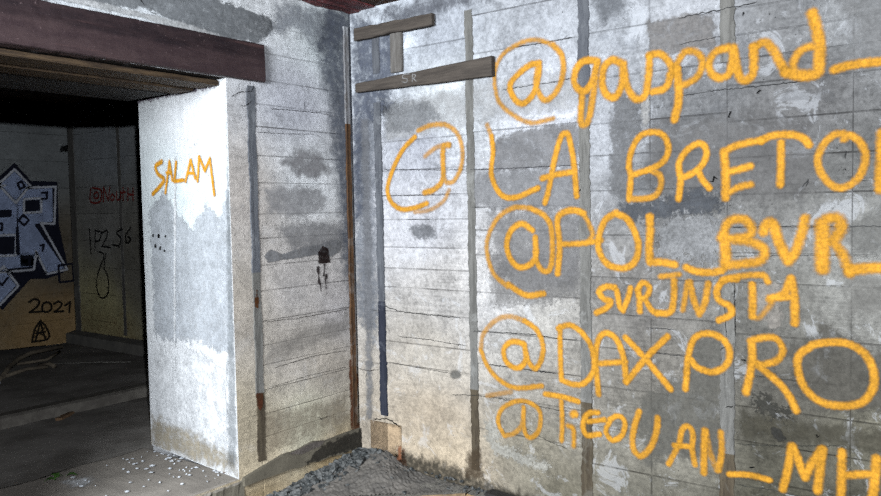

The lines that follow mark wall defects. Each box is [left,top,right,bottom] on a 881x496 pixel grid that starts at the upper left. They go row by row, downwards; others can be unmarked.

damp [266,6,580,419]
damp [305,430,362,464]